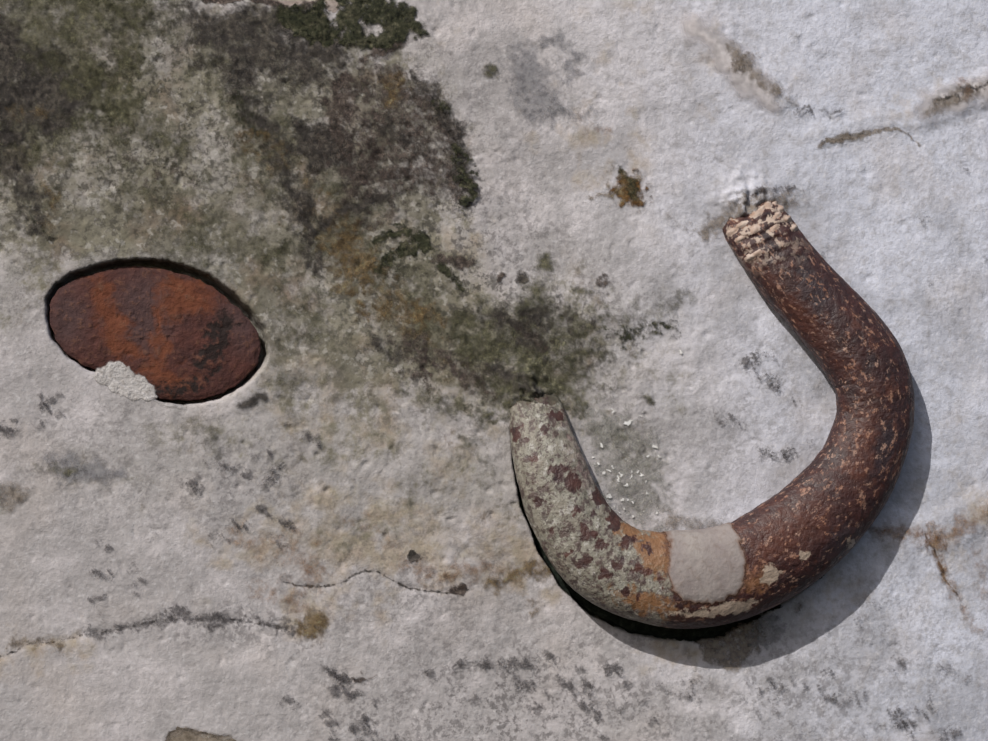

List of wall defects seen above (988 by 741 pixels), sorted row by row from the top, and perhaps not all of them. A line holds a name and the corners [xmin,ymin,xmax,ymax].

water stain [485,63,498,77]
water stain [512,51,573,126]
water stain [541,33,580,79]
water stain [187,2,381,269]
water stain [411,72,474,206]
crack [818,127,920,148]
water stain [371,327,496,412]
crack [286,550,469,595]
rust [486,559,551,594]
crack [10,604,328,653]
spalling [165,726,236,741]